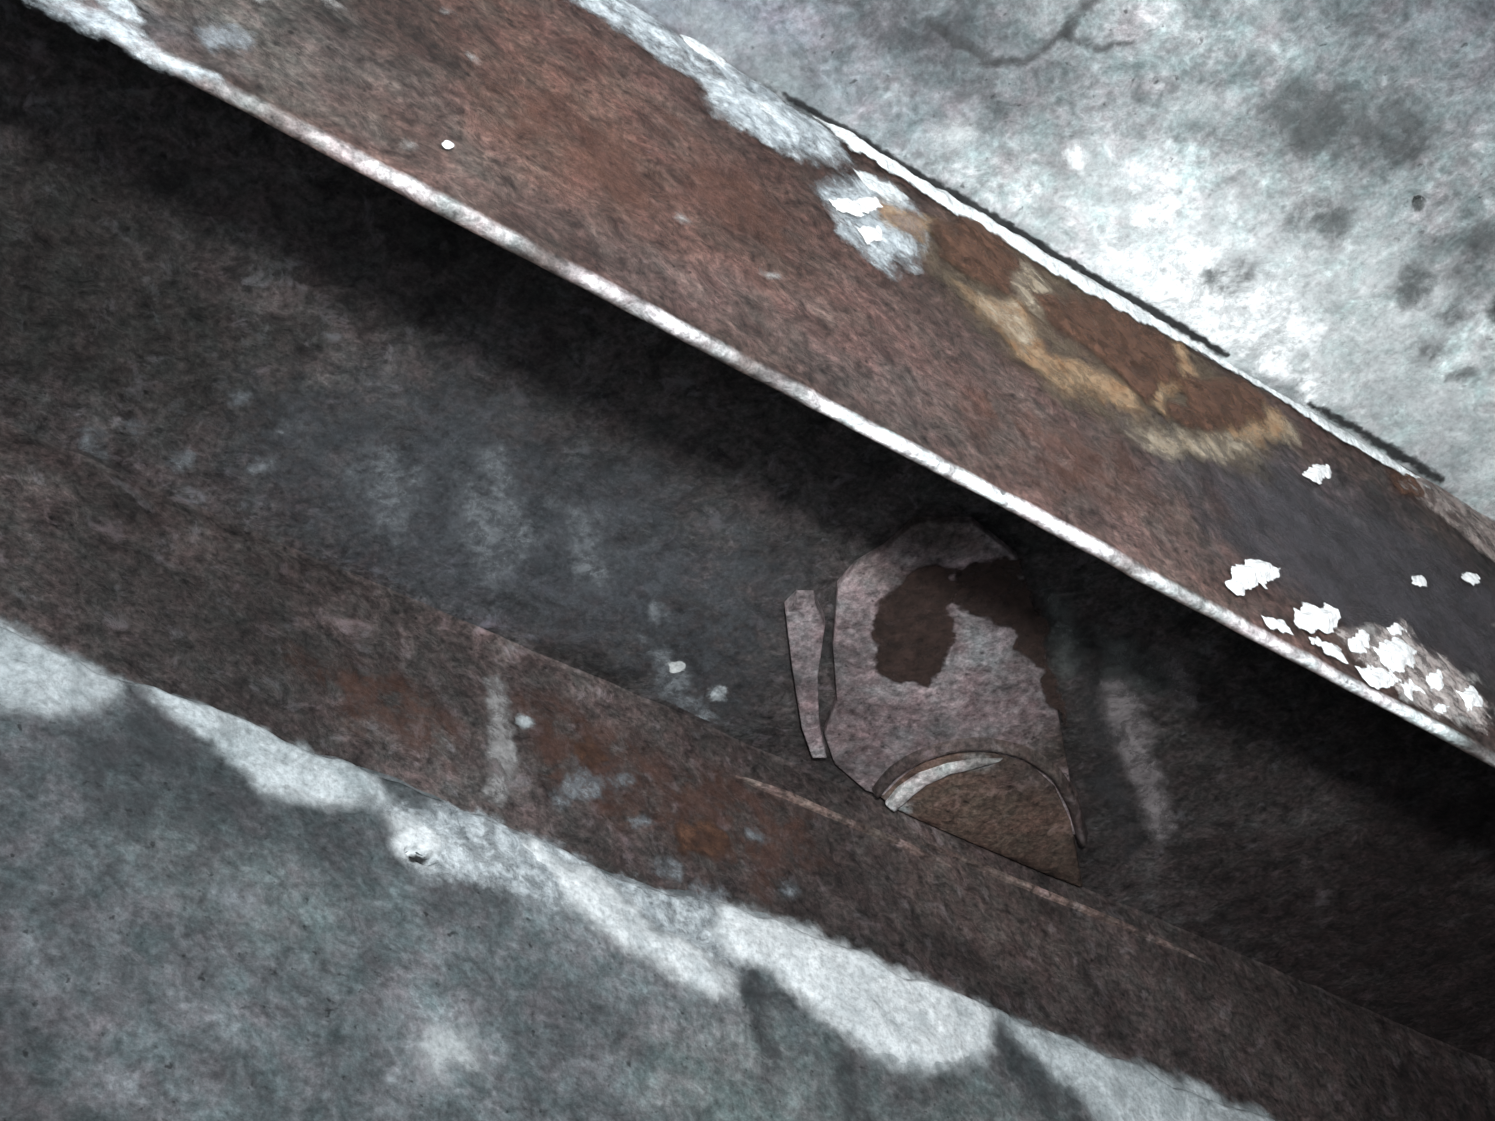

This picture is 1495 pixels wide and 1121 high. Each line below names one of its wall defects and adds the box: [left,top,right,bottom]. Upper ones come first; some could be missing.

crack [927,0,1132,66]
leakage [1279,83,1419,162]
corrosion [879,202,1297,459]
leakage [809,113,1495,492]
leakage [1241,485,1495,666]
leakage [0,623,1275,1121]